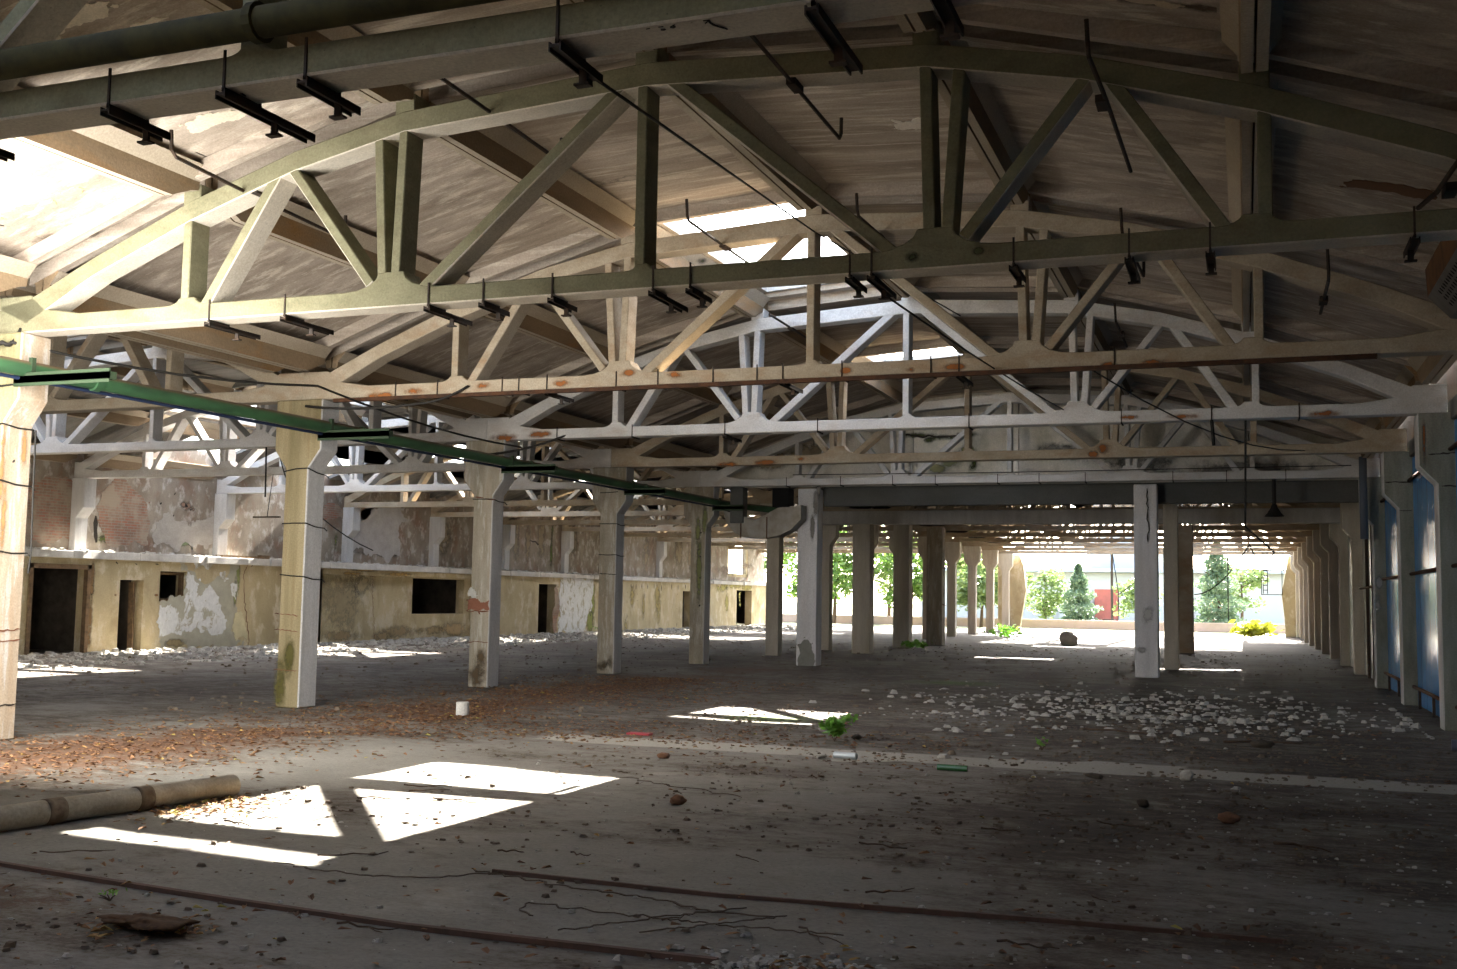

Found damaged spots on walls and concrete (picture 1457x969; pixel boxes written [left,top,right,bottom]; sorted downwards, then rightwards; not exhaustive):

peeling [152,512,249,649]
crack [273,862,844,936]